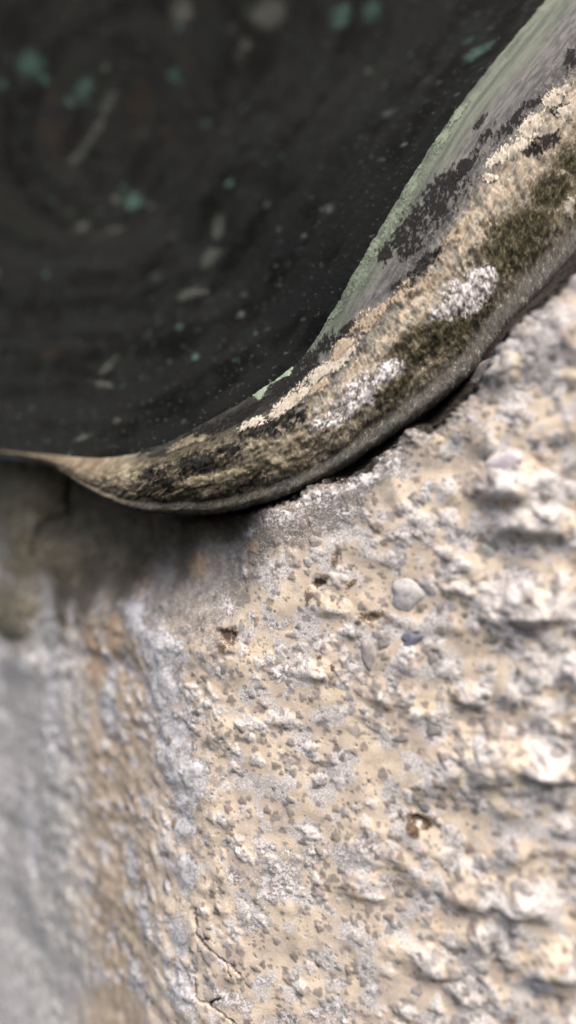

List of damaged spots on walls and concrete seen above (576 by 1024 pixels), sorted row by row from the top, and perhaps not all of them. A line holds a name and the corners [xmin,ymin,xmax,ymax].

crack [194,912,240,1022]